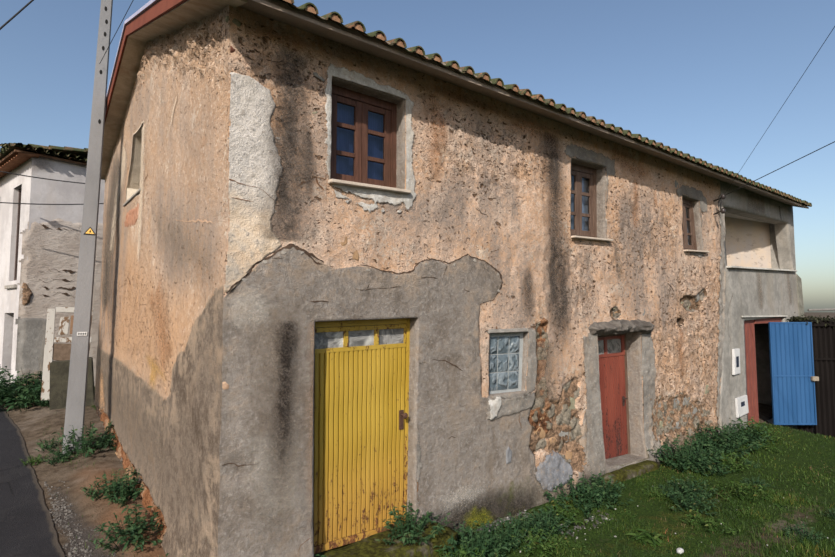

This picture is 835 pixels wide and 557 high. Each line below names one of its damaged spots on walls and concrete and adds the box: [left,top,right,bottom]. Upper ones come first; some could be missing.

peeling [17,218,82,344]
peeling [89,223,103,387]
damp [271,51,312,239]
peeling [334,189,387,212]
damp [545,134,567,333]
spalling [676,288,707,327]
spalling [96,409,167,540]
damp [277,322,294,459]
peeling [488,397,502,420]
spalling [528,318,588,472]